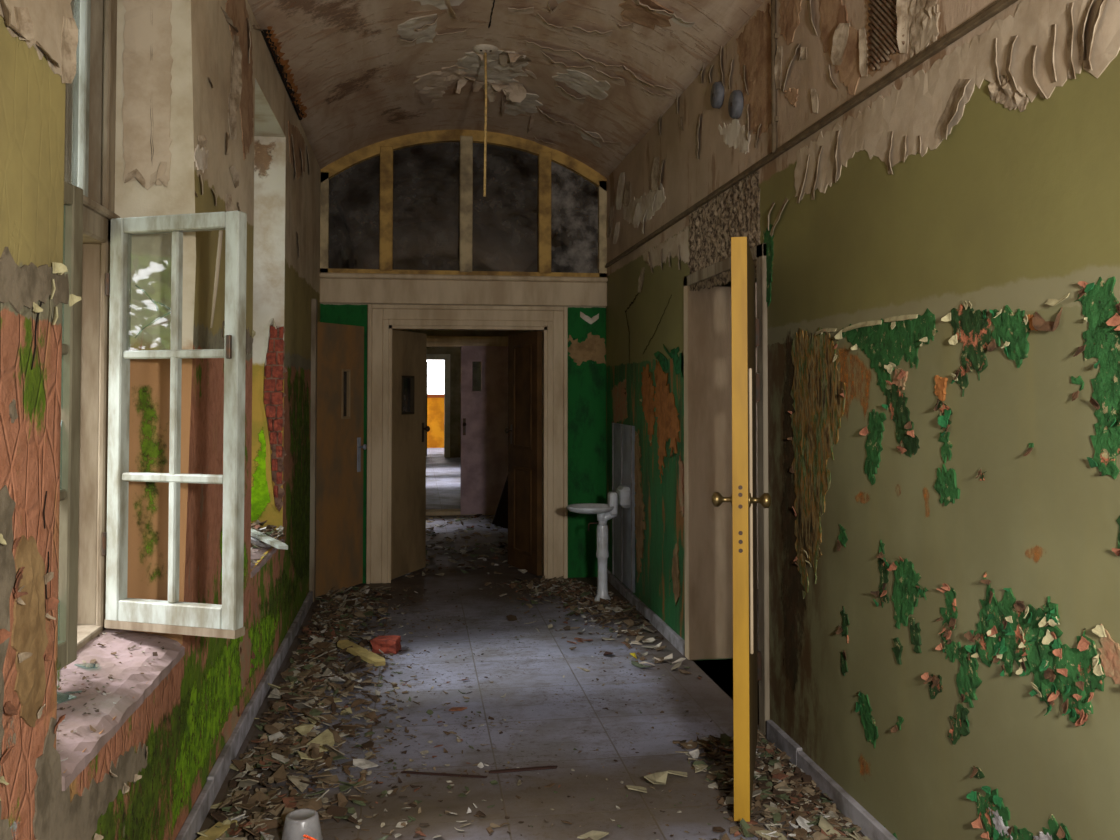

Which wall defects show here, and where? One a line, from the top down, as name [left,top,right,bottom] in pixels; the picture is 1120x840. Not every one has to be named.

peeling [194,0,264,212]
peeling [413,50,621,150]
peeling [619,0,694,30]
peeling [638,0,1120,307]
peeling [0,247,81,325]
spalling [246,319,287,512]
peeling [612,344,684,583]
peeling [787,277,1120,599]
peeling [835,606,850,676]
peeling [855,691,904,749]
peeling [870,540,1120,745]
peeling [966,766,1072,840]